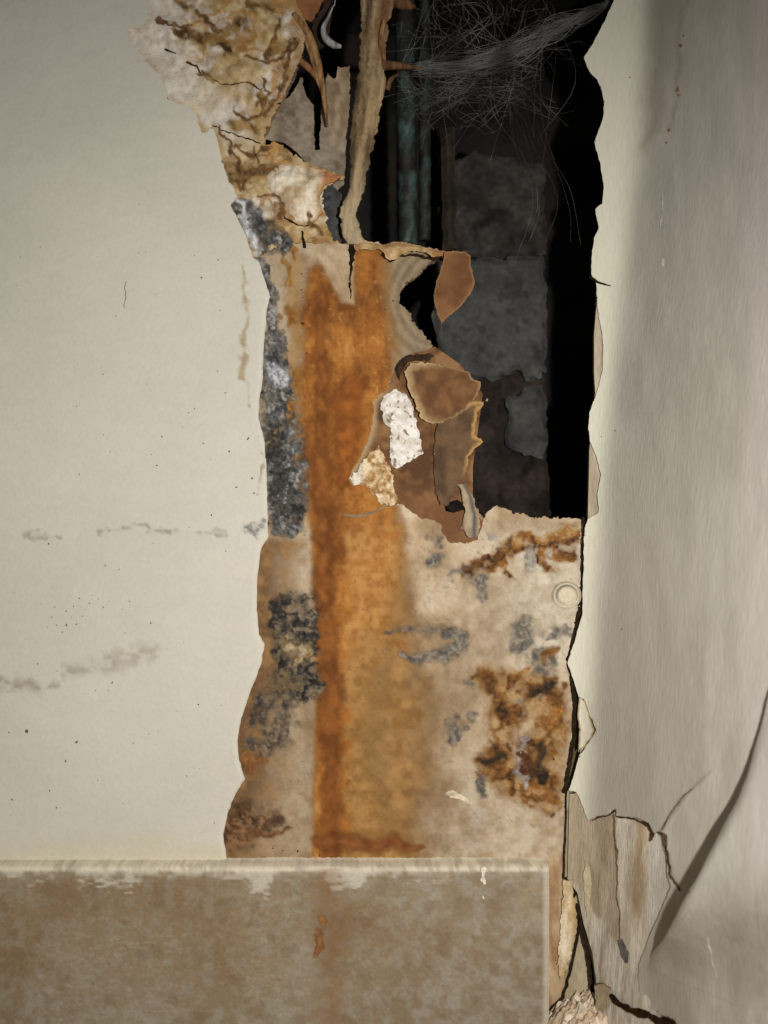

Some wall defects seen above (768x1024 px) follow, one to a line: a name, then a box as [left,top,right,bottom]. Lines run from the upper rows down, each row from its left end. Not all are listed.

crack [165,48,267,114]
damp [155,0,310,538]
crack [212,125,261,144]
flaking render [128,0,355,421]
peeling [350,247,443,495]
peeling [223,459,320,858]
damp [240,592,326,775]
rust [281,231,428,858]
damp [446,620,572,817]
damp [450,524,581,600]
peeling [384,439,670,1024]
crack [592,788,693,939]